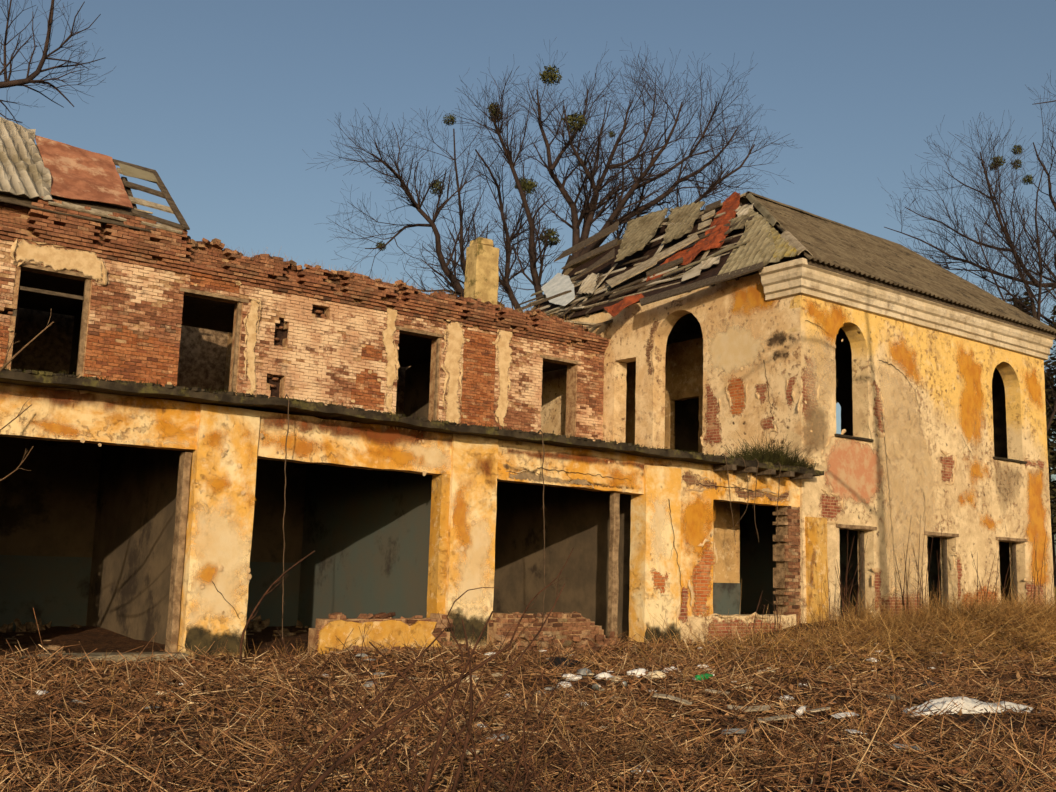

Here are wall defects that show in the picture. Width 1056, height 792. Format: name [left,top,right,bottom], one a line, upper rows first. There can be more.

water stain [1,389,152,408]
flaking render [700,375,769,448]
flaking render [761,417,777,432]
flaking render [819,378,886,525]
flaking render [940,450,998,529]
flaking render [650,471,790,643]